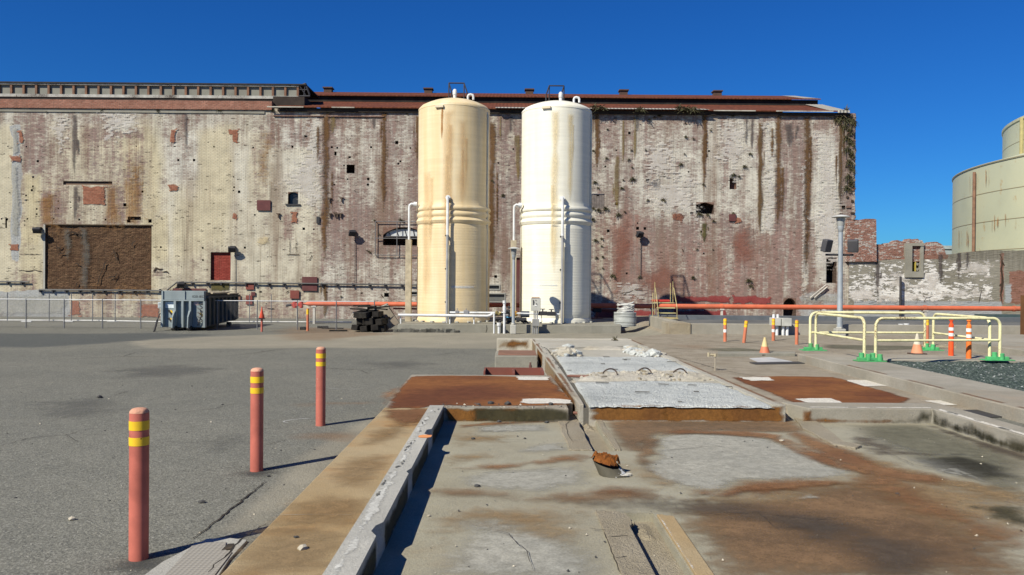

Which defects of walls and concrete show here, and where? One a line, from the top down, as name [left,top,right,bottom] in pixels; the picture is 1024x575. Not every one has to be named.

water stain [278,117,336,212]
water stain [714,119,777,230]
water stain [800,132,844,297]
peeling [850,272,992,304]
peeling [956,260,998,278]
rust [376,340,577,440]
rust [591,362,1020,501]
crack [193,481,266,538]